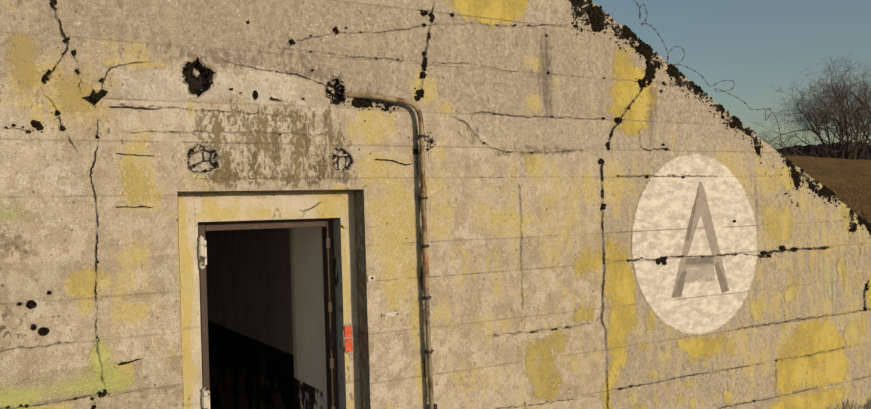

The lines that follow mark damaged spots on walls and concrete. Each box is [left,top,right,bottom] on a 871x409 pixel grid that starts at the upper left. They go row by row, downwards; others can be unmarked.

crack [121,88,287,135]
peeling [112,56,358,190]
crack [228,5,518,135]
crack [487,23,579,50]
crack [0,0,176,409]
crack [457,77,832,350]
crack [607,346,845,409]